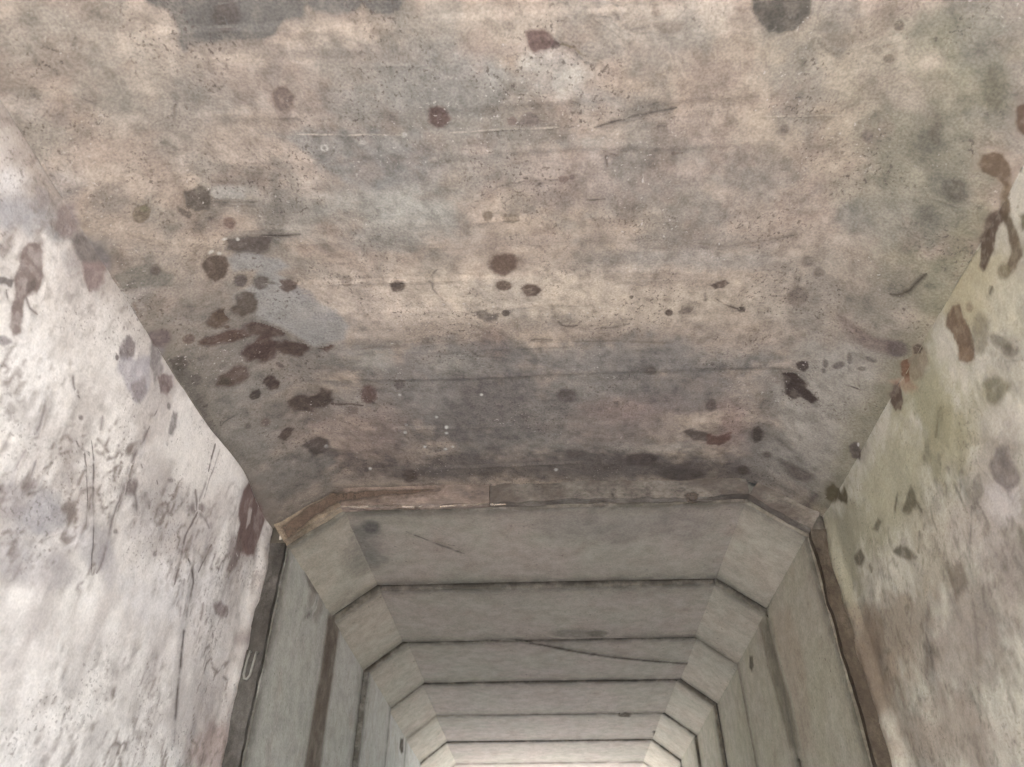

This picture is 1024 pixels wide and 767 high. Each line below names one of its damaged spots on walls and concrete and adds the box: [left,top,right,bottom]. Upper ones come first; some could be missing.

water stain [120,0,429,72]
water stain [739,0,906,53]
rust [968,96,1024,286]
rust [1,182,117,347]
water stain [820,309,913,374]
water stain [165,354,227,446]
rust [225,470,440,577]
water stain [619,451,709,481]
mould [749,424,774,459]
mould [818,478,851,512]
mould [846,439,863,463]
crack [485,638,688,666]